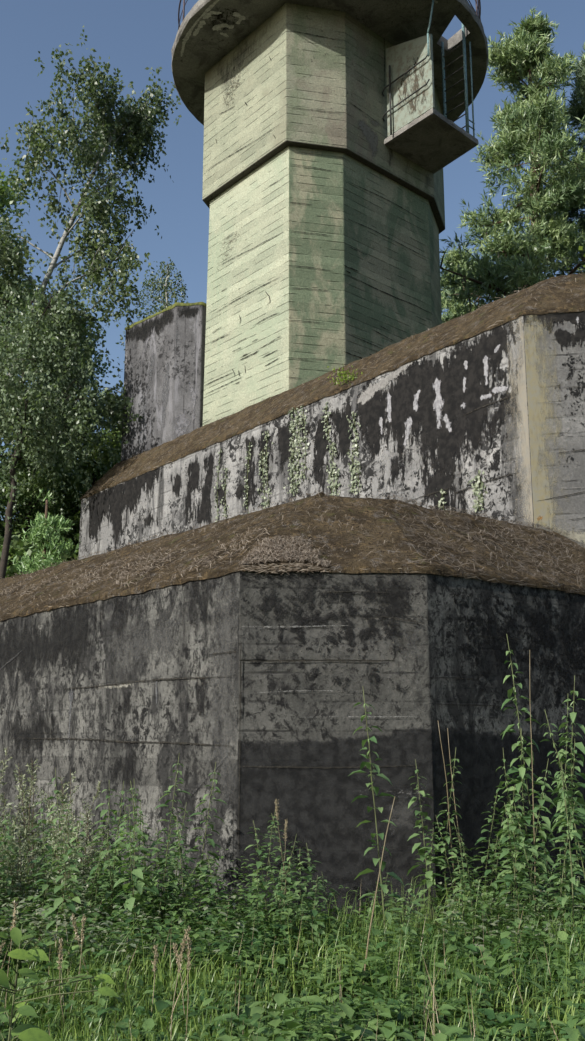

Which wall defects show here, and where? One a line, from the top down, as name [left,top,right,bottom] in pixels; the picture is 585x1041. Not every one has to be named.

water stain [87,306,585,549]
water stain [0,594,181,689]
water stain [8,690,73,753]
water stain [110,749,137,786]
water stain [187,578,585,918]